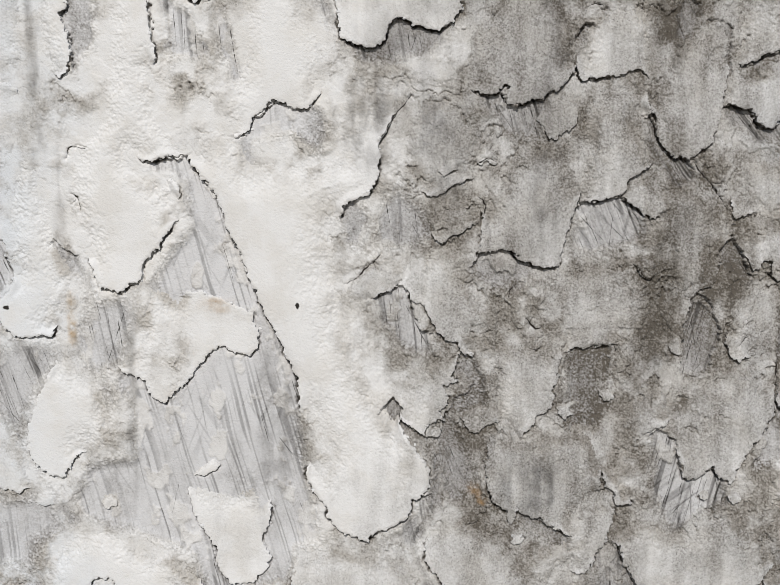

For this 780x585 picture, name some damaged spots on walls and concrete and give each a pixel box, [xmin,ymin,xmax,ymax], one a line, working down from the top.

spalling [0,441,80,575]
flaking render [0,161,135,478]
spalling [36,0,418,585]
flaking render [187,0,780,585]